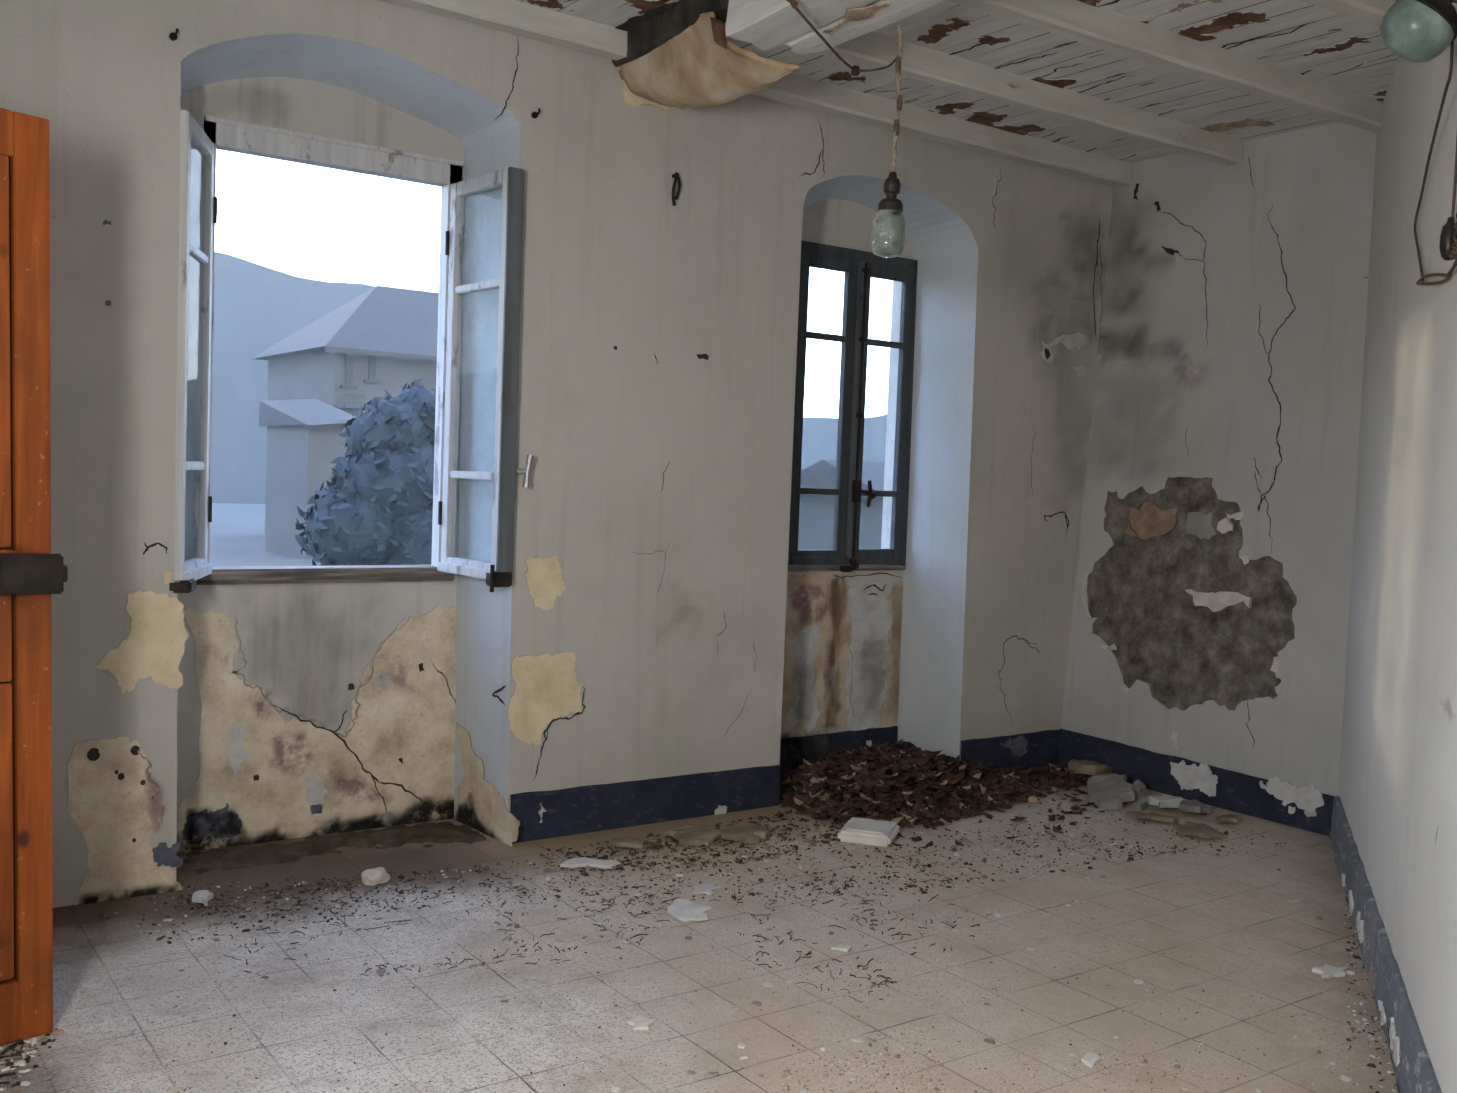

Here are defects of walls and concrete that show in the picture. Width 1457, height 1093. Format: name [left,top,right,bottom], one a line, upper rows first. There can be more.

peeling [917,17,1011,55]
peeling [1138,0,1395,75]
peeling [928,102,1069,143]
crack [1159,211,1208,351]
crack [1248,156,1296,550]
spalling [1081,477,1297,711]
flaking render [67,568,520,906]
crack [271,705,436,813]
crack [432,663,456,704]
flaking render [508,651,586,749]
peeling [1170,731,1218,797]
peeling [1260,774,1325,817]